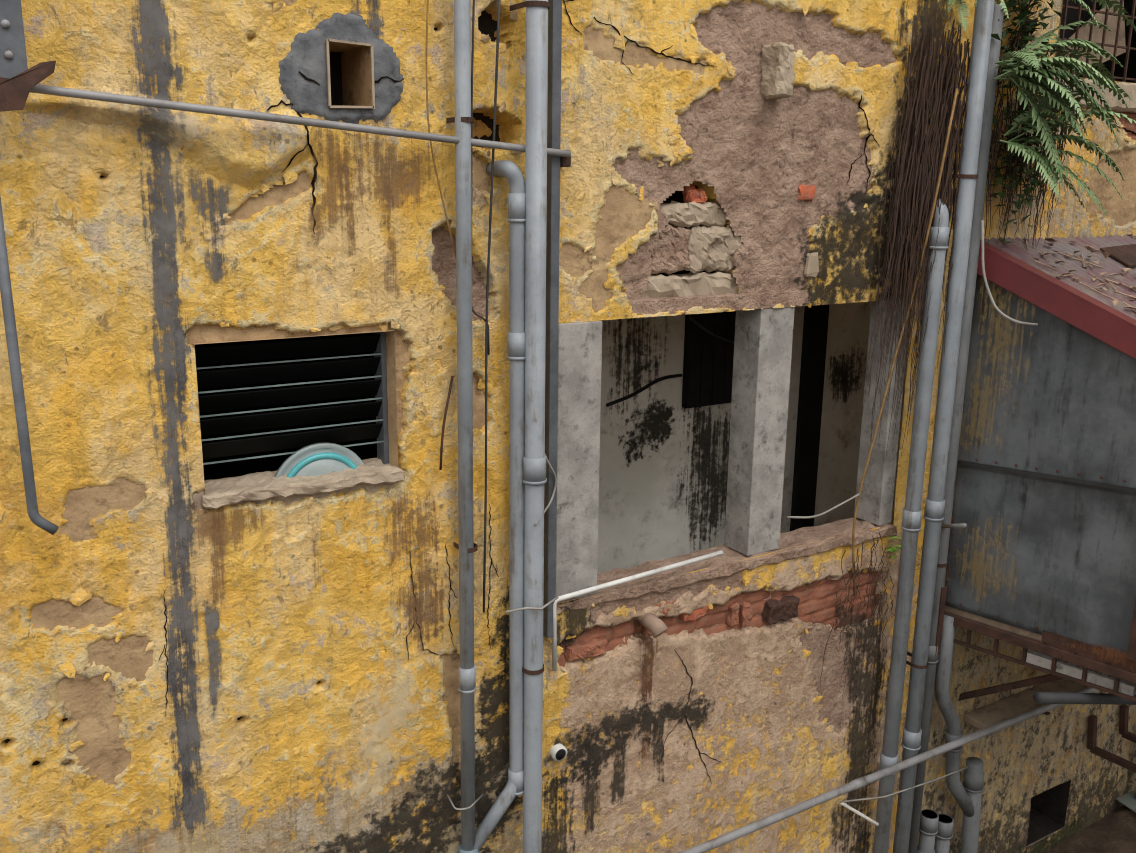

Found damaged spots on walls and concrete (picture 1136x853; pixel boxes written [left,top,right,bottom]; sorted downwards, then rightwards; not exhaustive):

crack [267,100,318,234]
flaking render [559,0,900,313]
flaking render [432,226,457,318]
peeling [59,477,159,542]
damp [110,0,229,834]
damp [603,317,730,550]
peeling [30,588,154,789]
damp [301,759,461,853]
damp [475,586,523,853]
damp [541,690,715,853]
crack [661,650,720,784]
flaking render [557,569,881,734]